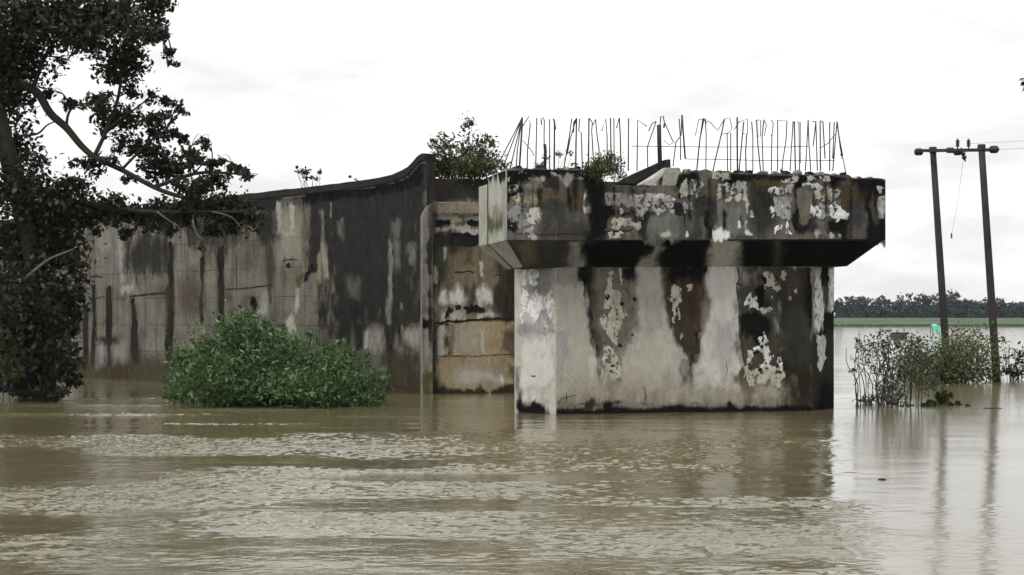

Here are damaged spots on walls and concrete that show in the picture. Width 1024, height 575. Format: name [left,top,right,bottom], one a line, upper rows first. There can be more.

peeling [499,115,849,240]
water stain [164,306,174,361]
water stain [166,241,174,292]
water stain [315,203,332,282]
peeling [520,268,555,336]
water stain [354,171,775,410]
peeling [596,268,637,382]
peeling [668,284,693,340]
peeling [744,332,786,390]
peeling [744,271,797,316]